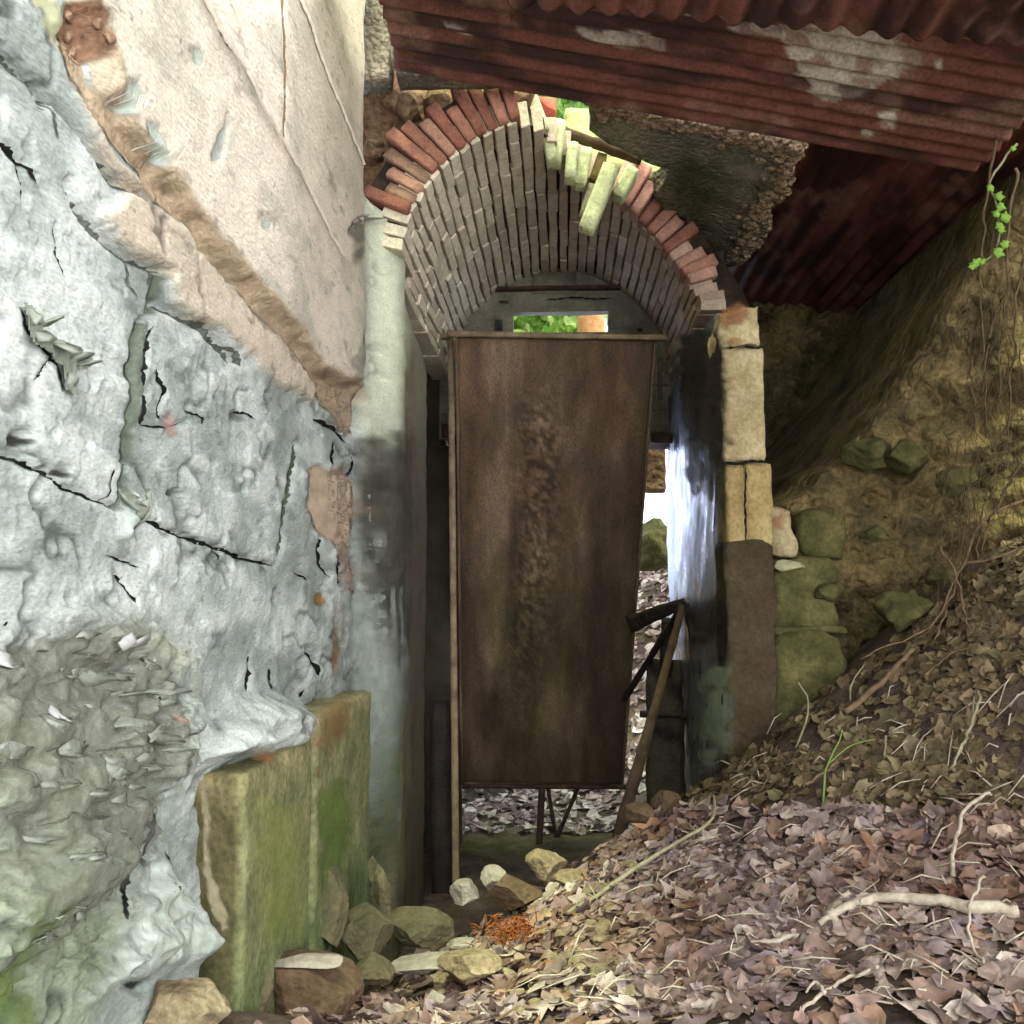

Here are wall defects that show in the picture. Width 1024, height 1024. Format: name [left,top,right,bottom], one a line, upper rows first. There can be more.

crack [0,143,37,203]
spalling [57,0,360,433]
peeling [21,302,103,395]
crack [52,192,241,429]
crack [0,456,115,508]
crack [145,444,354,594]
damp [361,408,414,635]
damp [673,328,734,521]
crack [724,460,765,539]
damp [683,596,726,660]
spalling [0,631,198,963]
spalling [200,783,228,929]